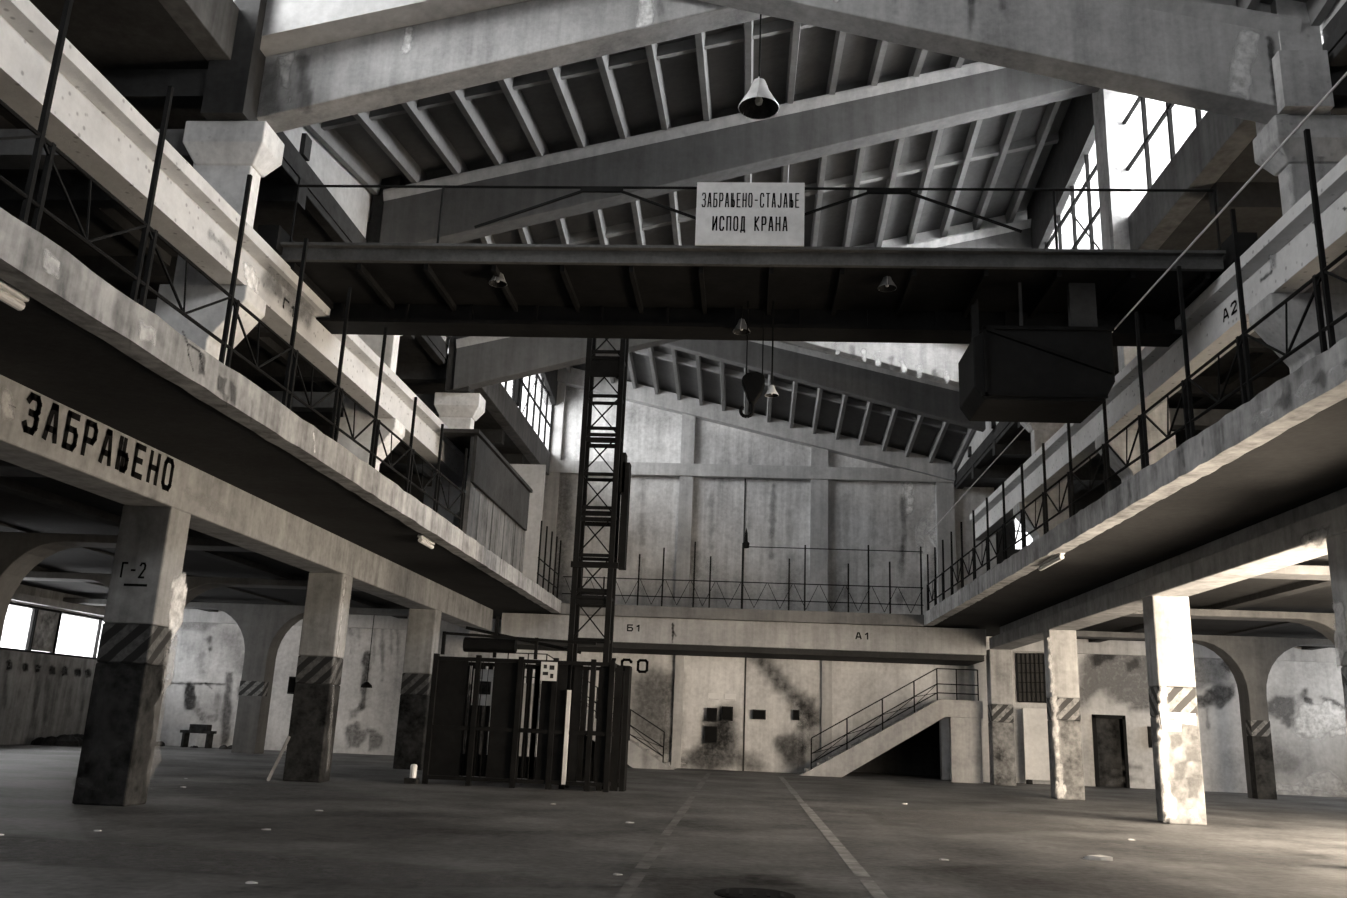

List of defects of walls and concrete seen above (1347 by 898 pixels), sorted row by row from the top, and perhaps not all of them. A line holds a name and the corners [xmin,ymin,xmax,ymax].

flaking render [346,651,382,749]
flaking render [1079,654,1199,822]
flaking render [1194,658,1234,708]
flaking render [1267,686,1347,740]